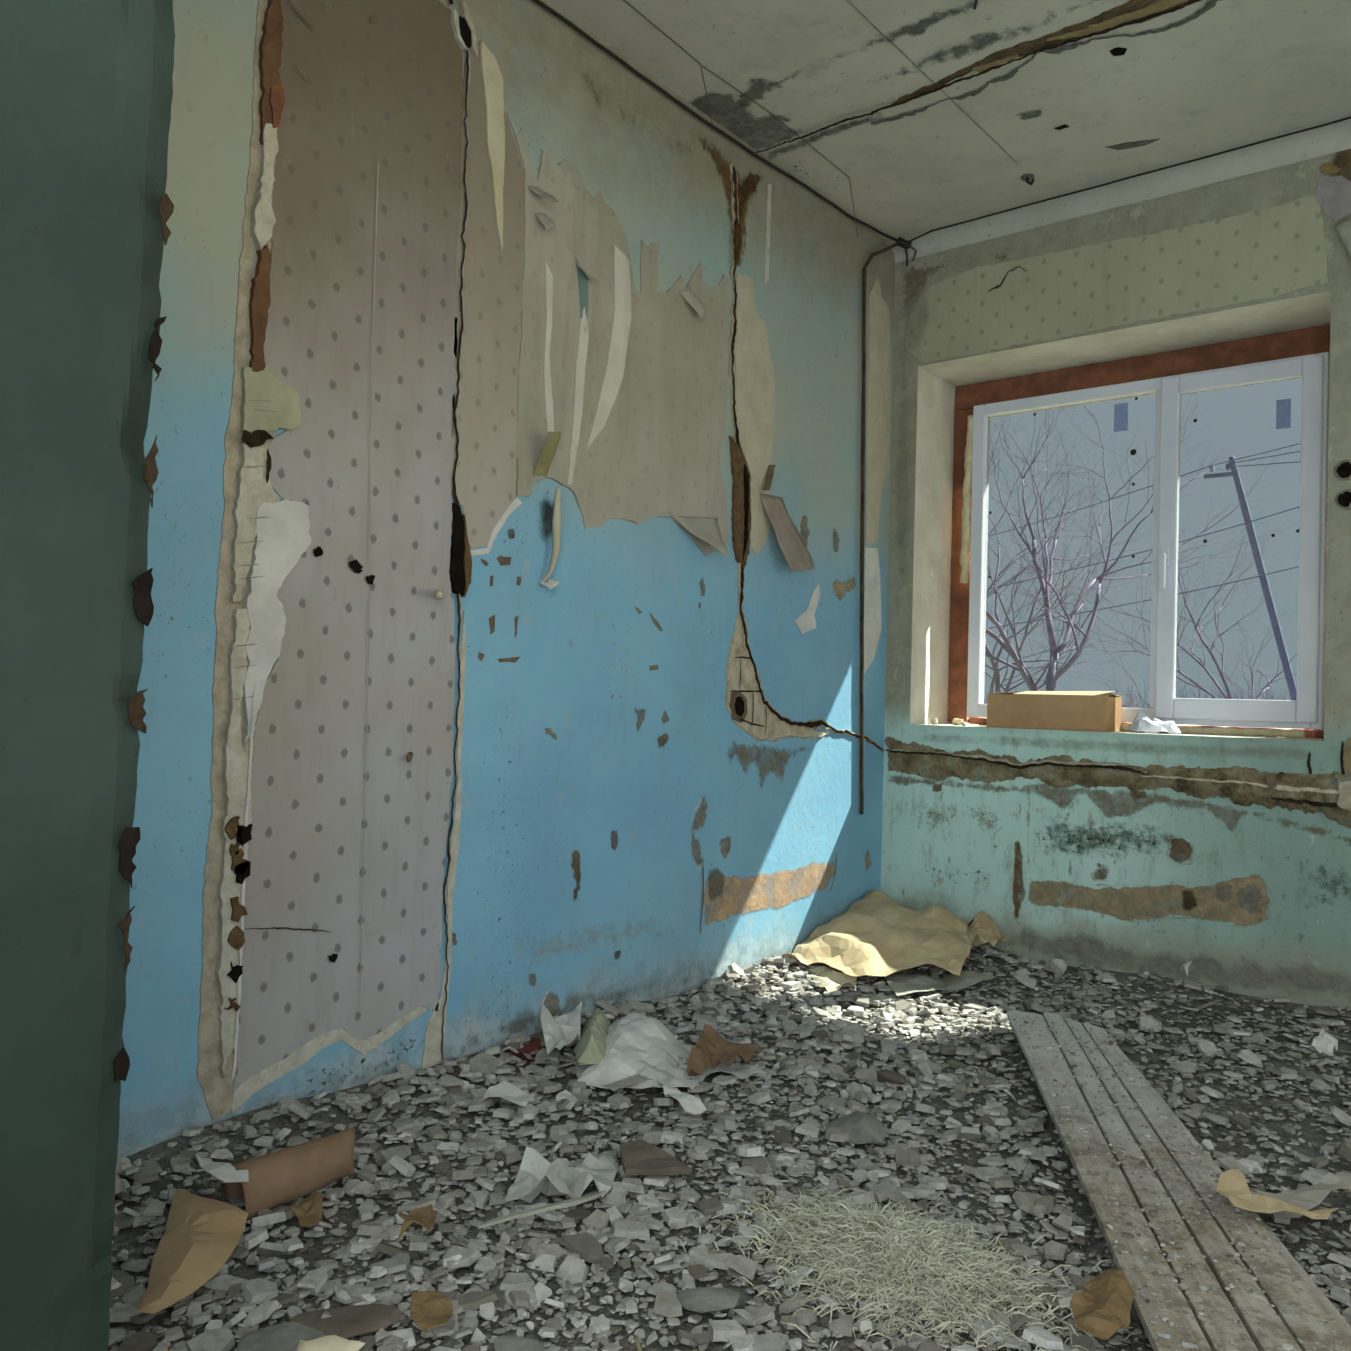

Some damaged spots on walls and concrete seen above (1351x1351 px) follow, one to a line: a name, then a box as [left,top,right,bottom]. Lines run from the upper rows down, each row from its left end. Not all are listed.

damp [870,3,974,45]
peeling [480,41,505,251]
damp [692,74,876,158]
flaking render [149,316,167,382]
crack [728,0,1222,752]
flaking render [196,0,311,1120]
flaking render [132,568,154,626]
flaking render [127,689,148,733]
crack [1305,752,1313,774]
flaking render [117,827,140,888]
peeling [690,792,837,934]
peeling [1025,864,1273,928]